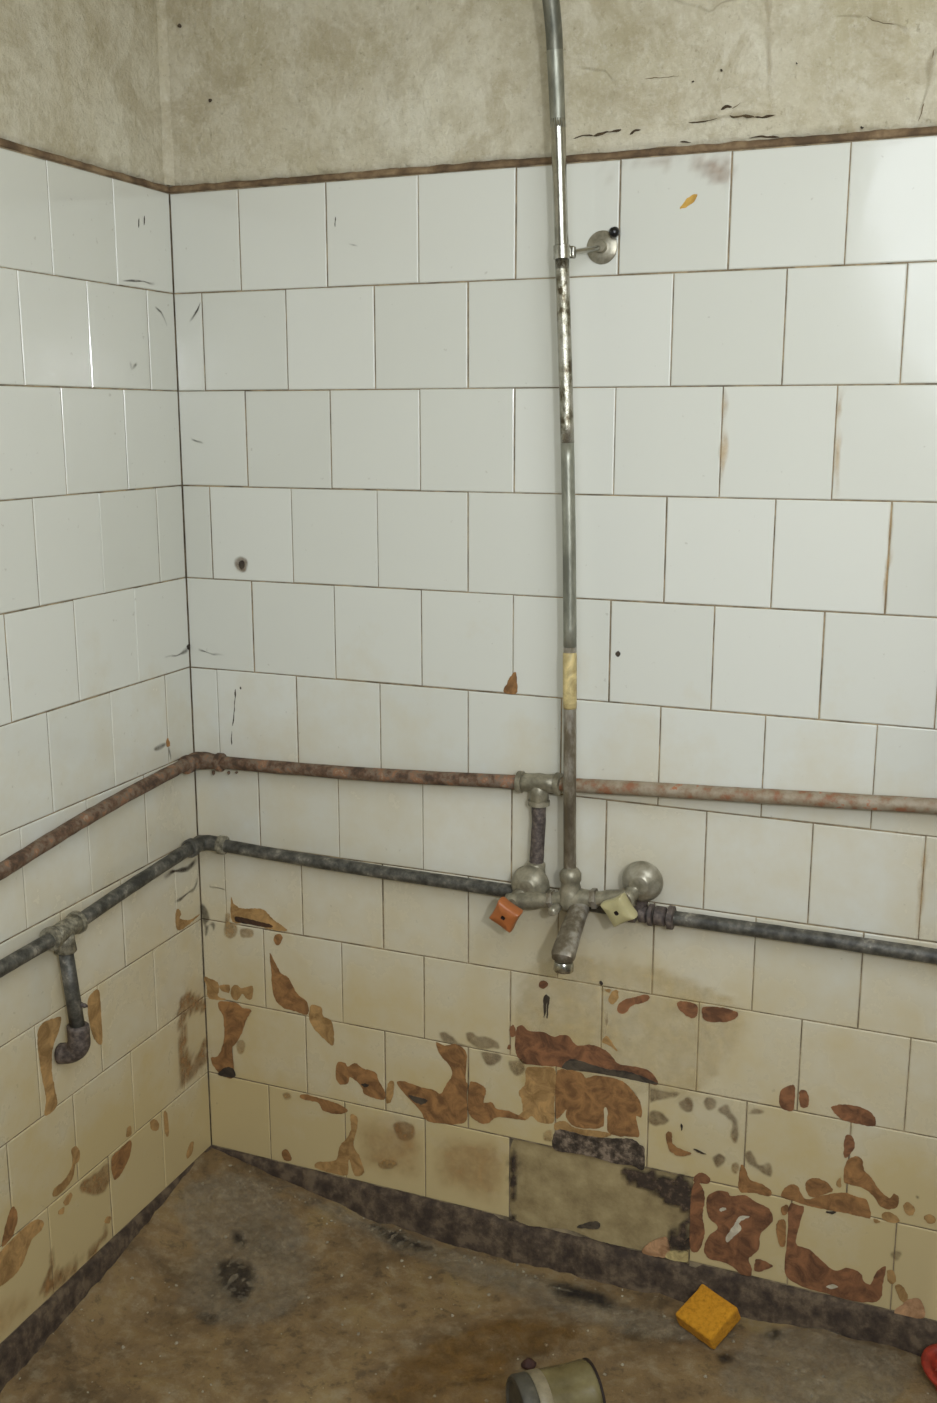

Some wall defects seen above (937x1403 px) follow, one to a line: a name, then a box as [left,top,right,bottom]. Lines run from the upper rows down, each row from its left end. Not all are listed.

peeling [204,976,253,1079]
peeling [225,897,334,1046]
peeling [599,981,650,1014]
peeling [677,1001,738,1022]
peeling [0,1126,132,1286]
peeling [150,1111,169,1137]
peeling [283,1093,396,1176]
peeling [336,1025,936,1319]